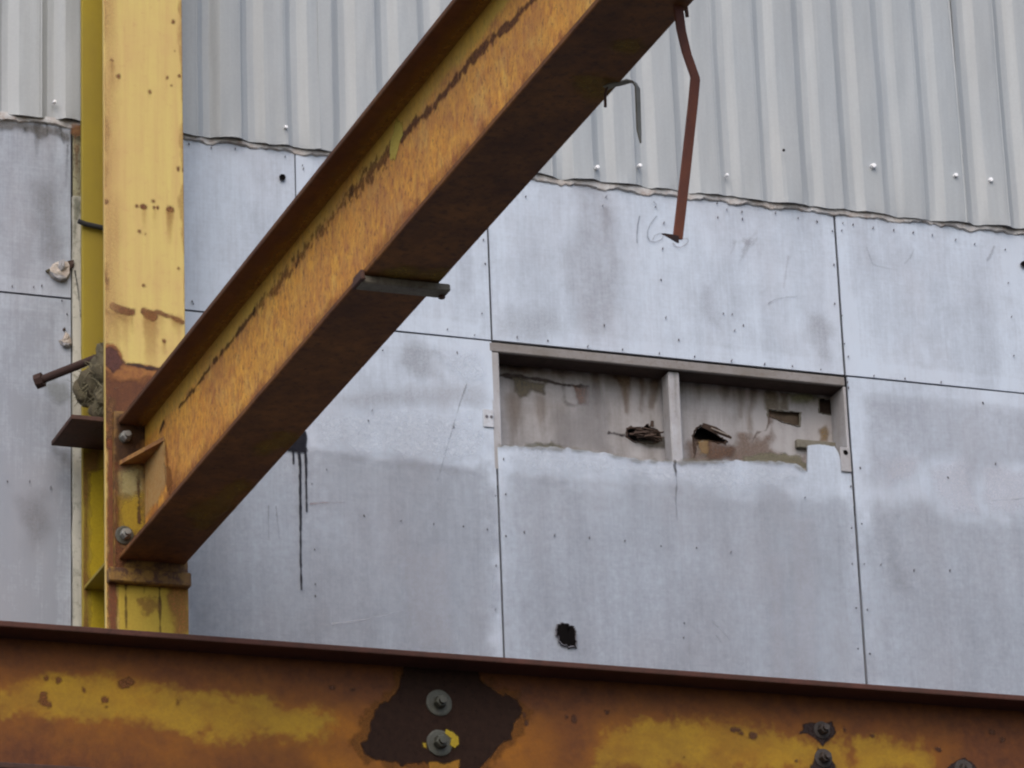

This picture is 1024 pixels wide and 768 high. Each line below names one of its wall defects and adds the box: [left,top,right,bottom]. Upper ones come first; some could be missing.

corrosion [339,0,537,208]
corrosion [110,303,184,324]
corrosion [179,244,305,408]
corrosion [159,420,173,495]
spalling [608,421,665,448]
spalling [692,423,734,459]
spalling [766,408,802,427]
spalling [818,398,831,415]
corrosion [38,676,62,707]
corrosion [351,667,529,768]
corrosion [800,721,846,768]